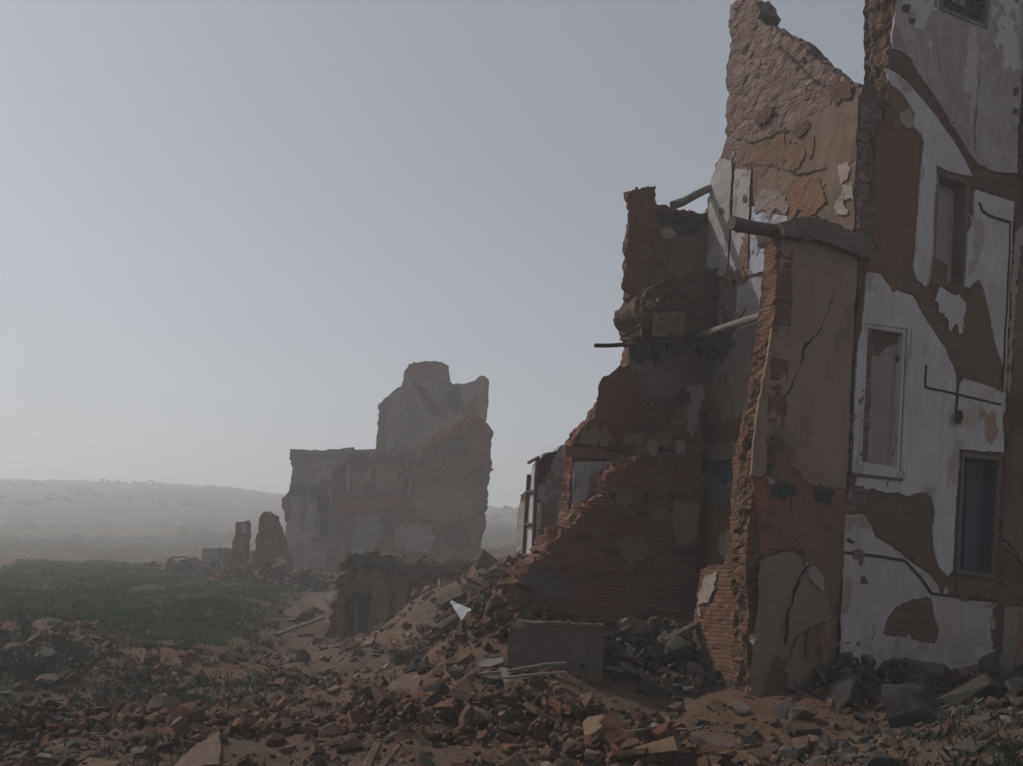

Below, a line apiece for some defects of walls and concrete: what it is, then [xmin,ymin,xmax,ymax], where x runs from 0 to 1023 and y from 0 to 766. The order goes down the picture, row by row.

peeling [901,0,936,54]
peeling [982,0,1023,73]
spalling [867,48,1023,453]
crack [773,260,860,495]
spalling [846,473,996,598]
flaking render [696,571,717,616]
crack [784,566,843,662]
spalling [884,597,939,644]